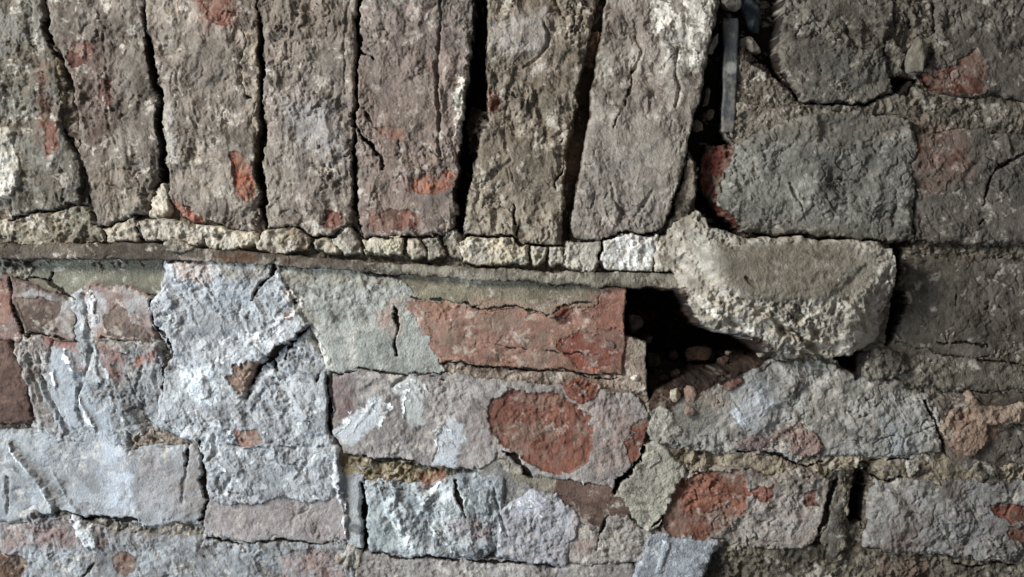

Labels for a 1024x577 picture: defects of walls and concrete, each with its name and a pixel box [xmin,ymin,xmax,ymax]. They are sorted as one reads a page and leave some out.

crack [284,0,688,260]
crack [358,296,618,381]
spalling [425,286,777,577]